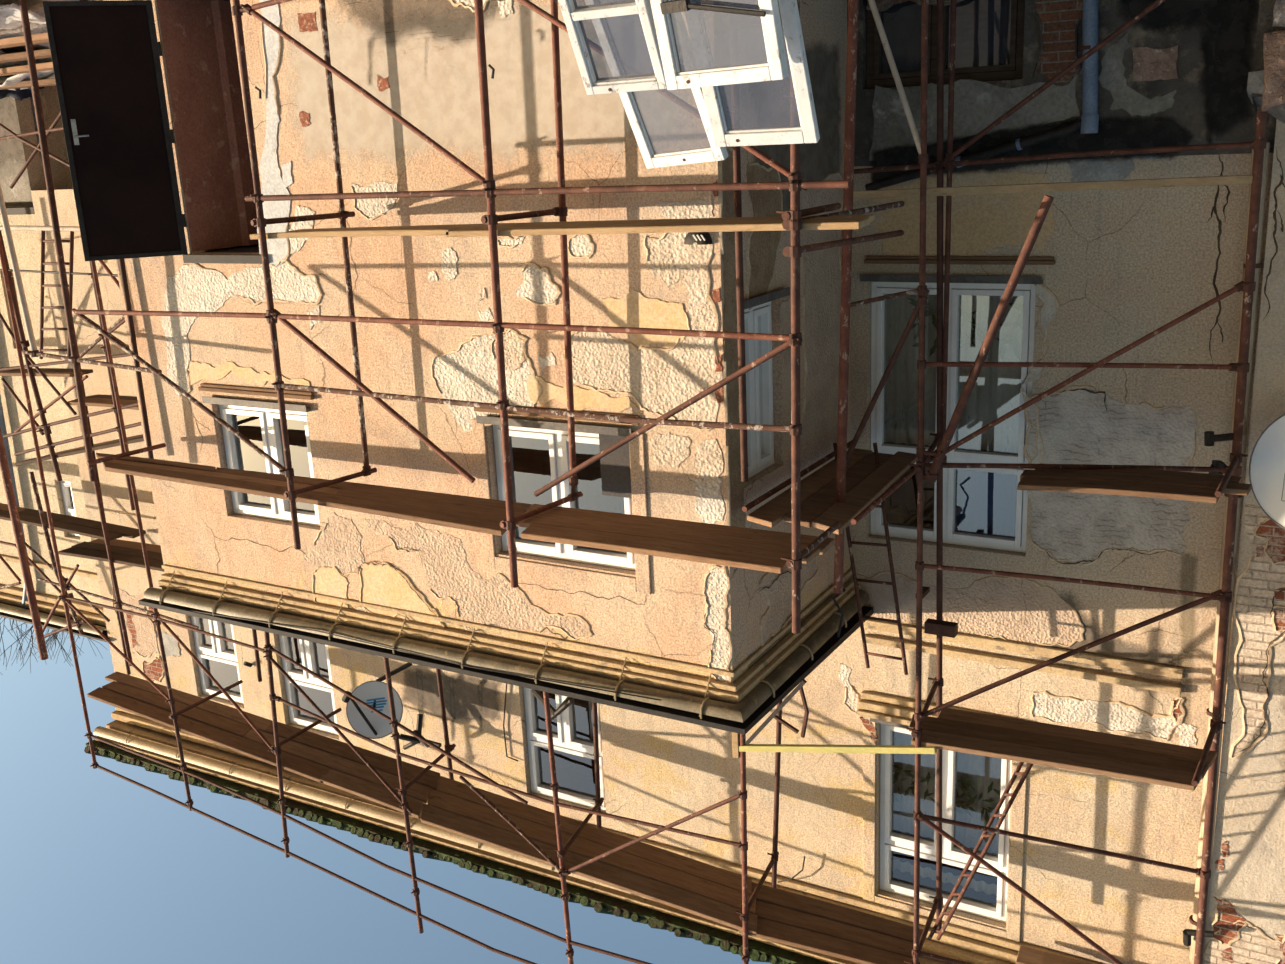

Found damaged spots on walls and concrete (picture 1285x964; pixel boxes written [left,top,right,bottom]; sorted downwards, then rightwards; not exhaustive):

flaking render [1032,0,1083,86]
peeling [241,205,324,329]
spalling [521,261,562,306]
crack [1207,155,1230,370]
crack [1263,149,1285,320]
spalling [431,288,556,407]
crack [202,519,306,569]
crack [320,521,504,631]
crack [518,583,646,605]
flaking render [1229,518,1285,759]
peeling [1030,690,1197,747]
flaking render [1204,897,1285,964]